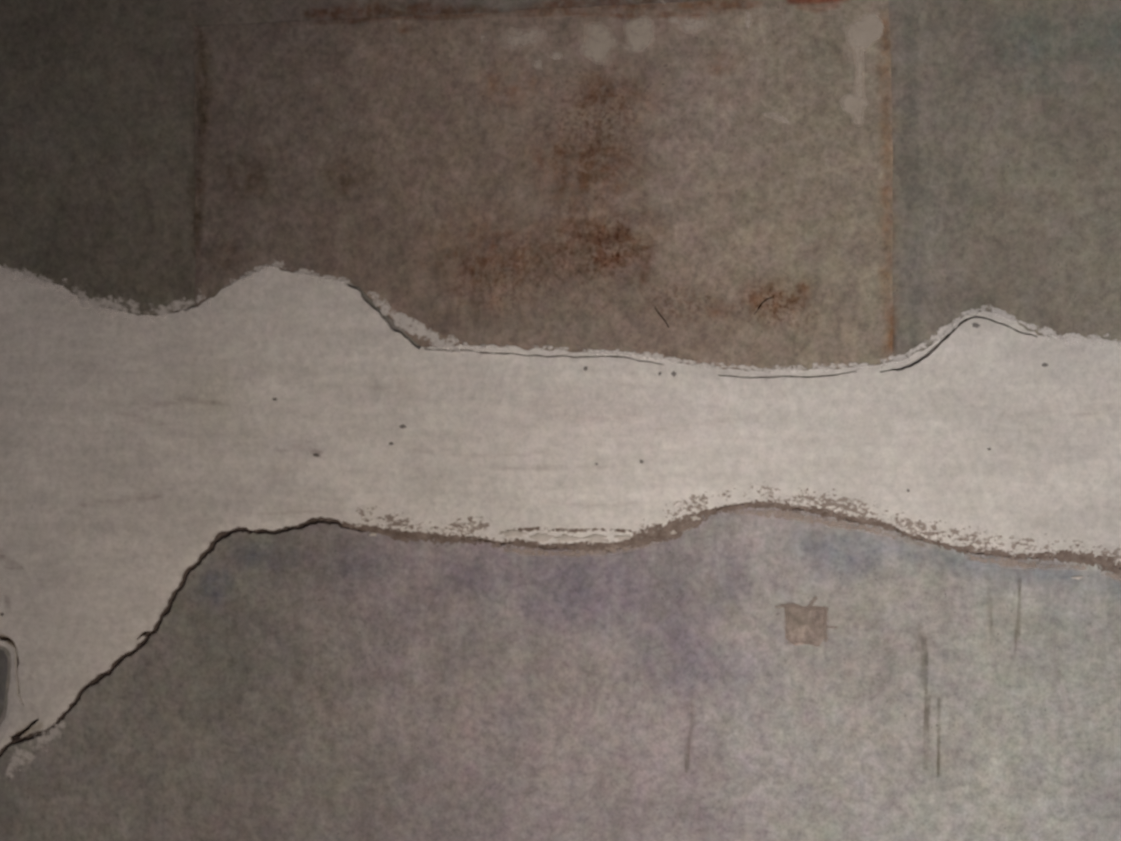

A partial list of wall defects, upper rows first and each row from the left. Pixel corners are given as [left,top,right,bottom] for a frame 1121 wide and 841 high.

crack [346,283,664,365]
crack [718,316,1037,378]
spalling [341,486,1121,580]
spalling [0,649,8,717]